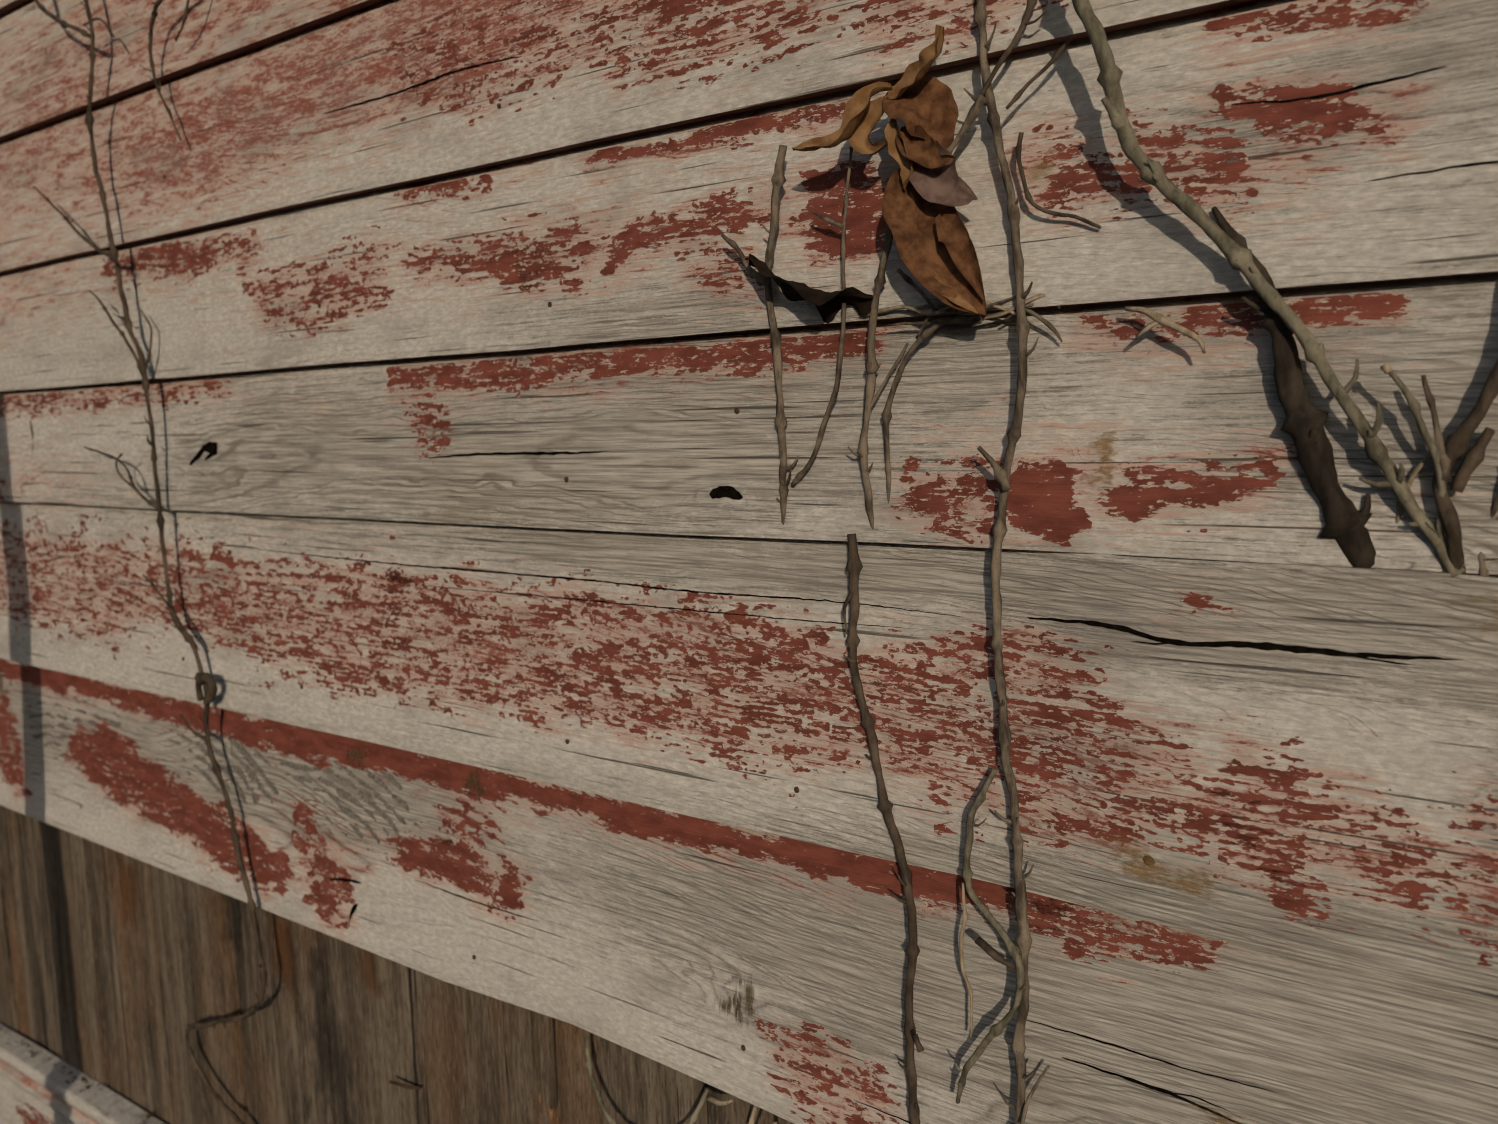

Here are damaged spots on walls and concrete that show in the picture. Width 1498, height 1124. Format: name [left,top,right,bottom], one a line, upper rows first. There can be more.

peeling [384,0,1069,136]
peeling [1202,0,1429,42]
peeling [583,102,847,172]
peeling [1032,82,1396,227]
peeling [100,187,771,341]
peeling [788,160,889,268]
peeling [0,380,232,424]
peeling [386,331,883,466]
crack [1027,617,1462,665]
peeling [0,479,1498,974]
peeling [754,1006,908,1124]
crack [1026,1020,1279,1124]